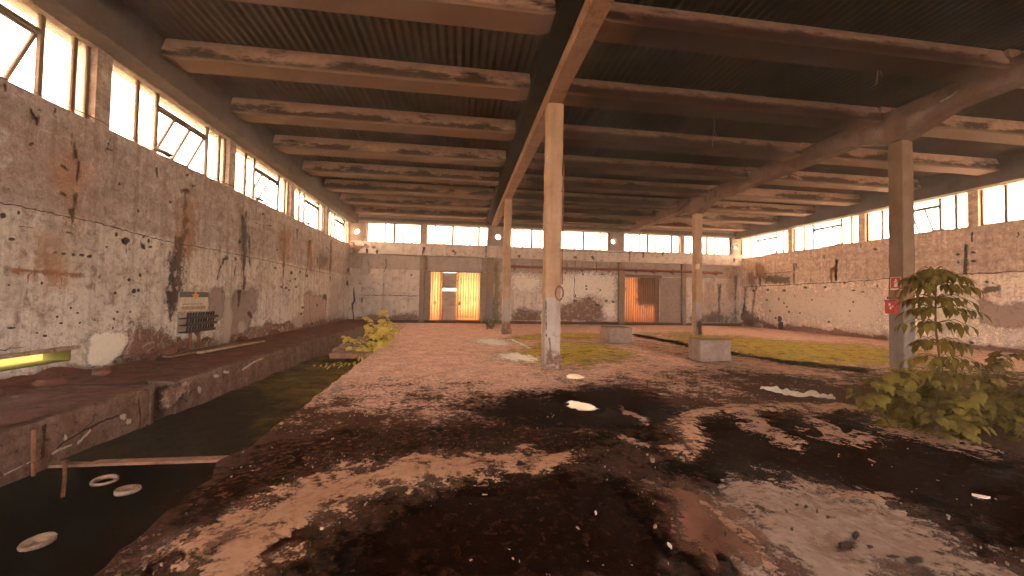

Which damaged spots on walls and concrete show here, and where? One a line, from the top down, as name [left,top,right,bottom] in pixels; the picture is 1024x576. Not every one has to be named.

rust [59,132,81,234]
leakage [163,243,185,322]
crack [0,202,414,319]
leakage [217,213,272,307]